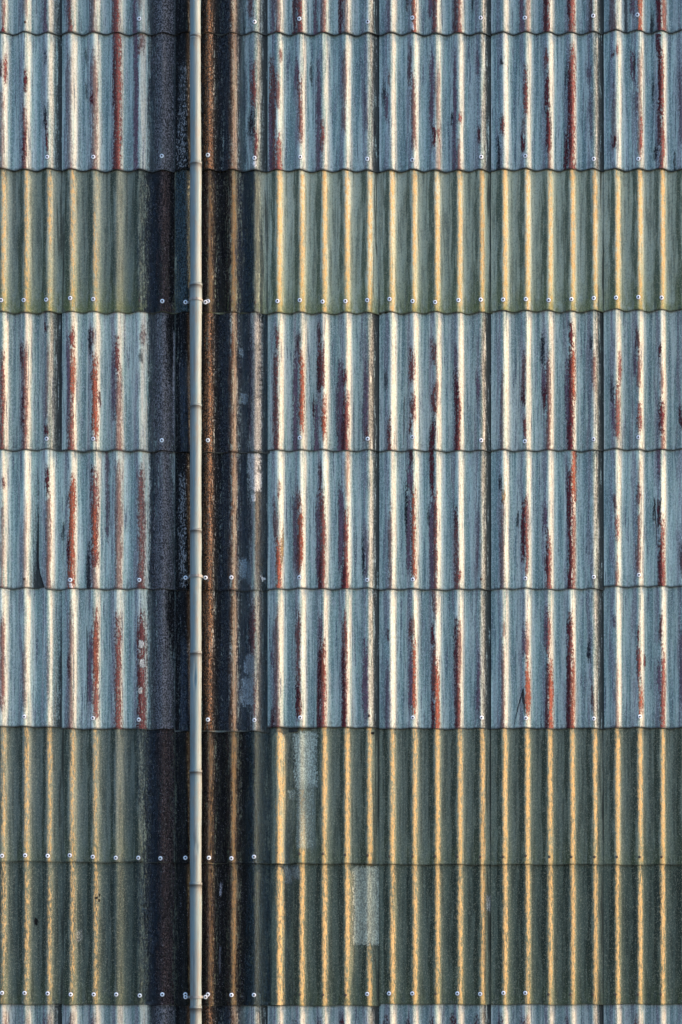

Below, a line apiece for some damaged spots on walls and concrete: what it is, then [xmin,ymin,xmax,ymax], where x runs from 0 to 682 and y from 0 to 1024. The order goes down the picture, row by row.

corrosion [112,0,145,171]
corrosion [247,50,283,171]
corrosion [543,0,593,170]
corrosion [609,0,682,171]
corrosion [44,326,123,589]
water stain [137,0,271,1024]
corrosion [272,464,350,589]
corrosion [388,339,441,728]
corrosion [564,322,577,589]
corrosion [136,611,148,729]
corrosion [543,607,576,728]